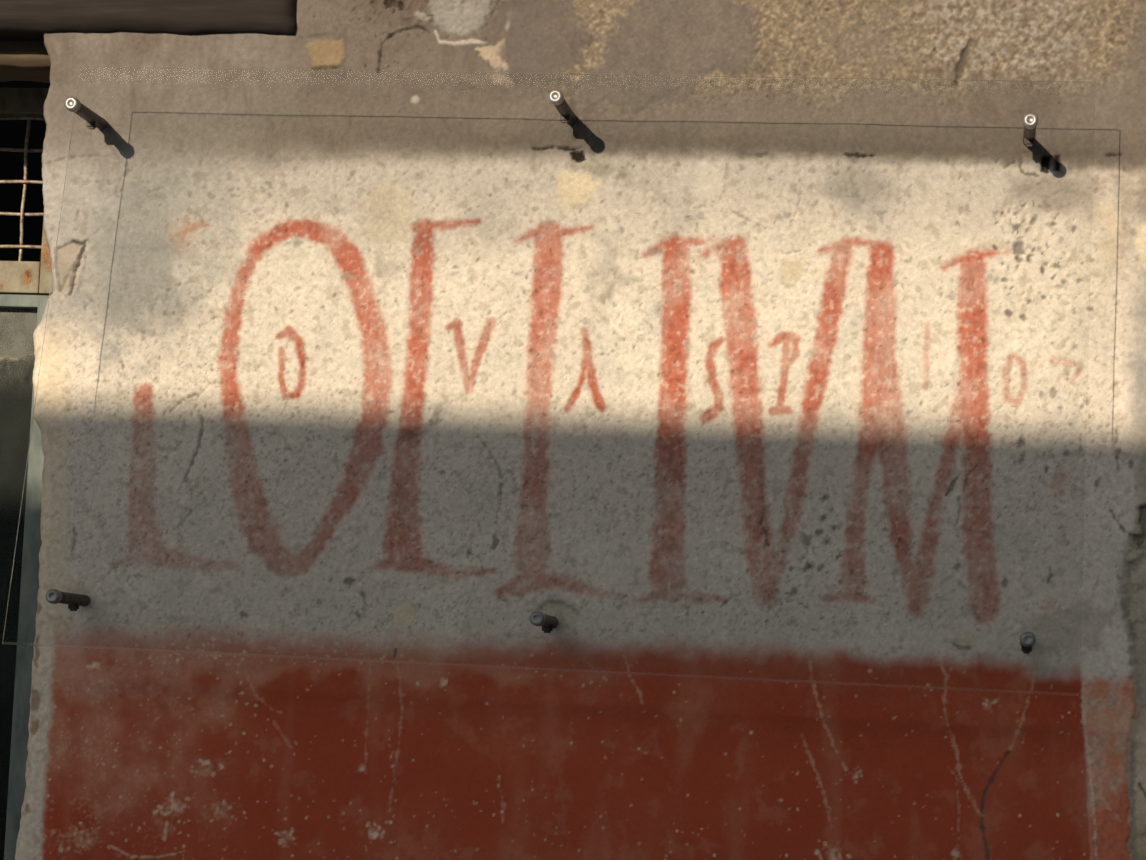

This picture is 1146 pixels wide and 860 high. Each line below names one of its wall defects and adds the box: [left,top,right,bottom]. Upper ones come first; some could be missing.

peeling [407,93,422,105]
peeling [381,0,512,88]
crack [473,429,520,552]
crack [1108,502,1146,644]
crack [936,651,1042,860]
crack [1079,662,1146,860]